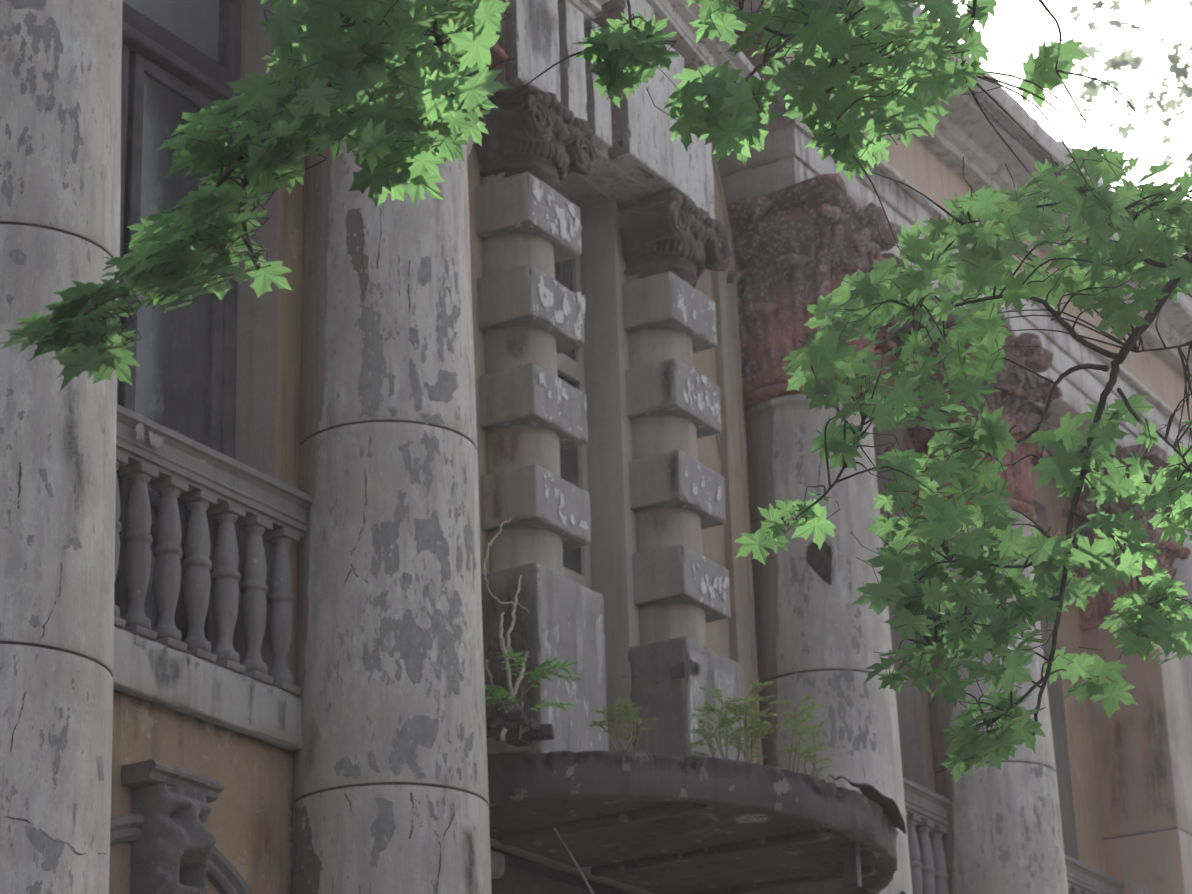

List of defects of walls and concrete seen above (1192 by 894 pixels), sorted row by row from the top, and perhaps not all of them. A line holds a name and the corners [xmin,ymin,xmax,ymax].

peeling [7,0,83,206]
peeling [0,124,33,219]
peeling [533,181,583,242]
peeling [677,289,716,332]
peeling [346,208,476,698]
crack [344,470,368,584]
peeling [40,707,81,789]
flaking render [25,826,65,894]
crack [6,816,106,855]